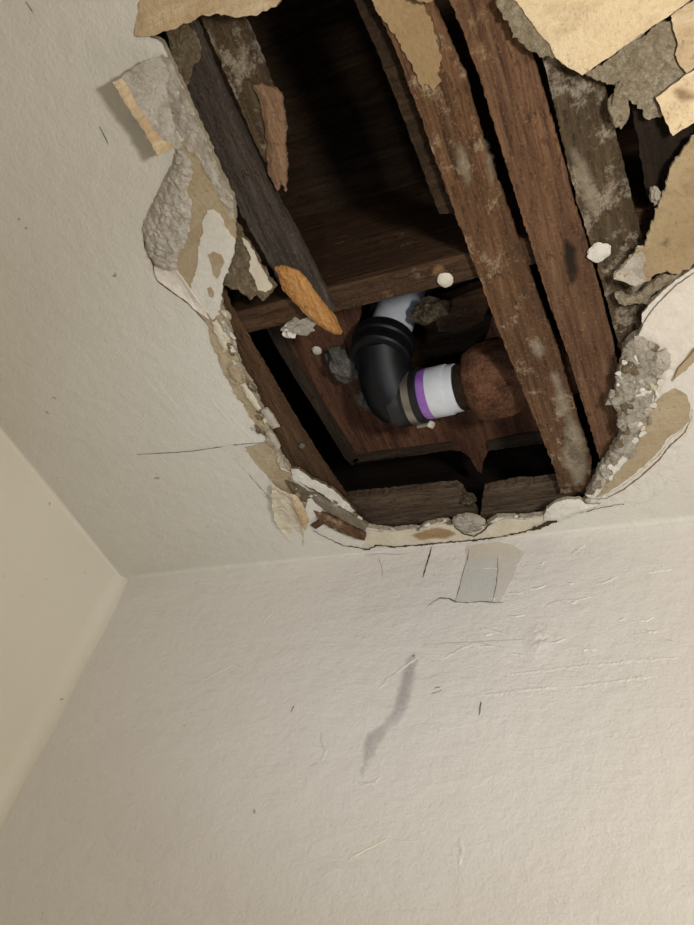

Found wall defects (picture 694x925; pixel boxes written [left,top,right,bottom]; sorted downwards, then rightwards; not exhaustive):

crack [137,442,266,455]
peeling [112,54,694,603]